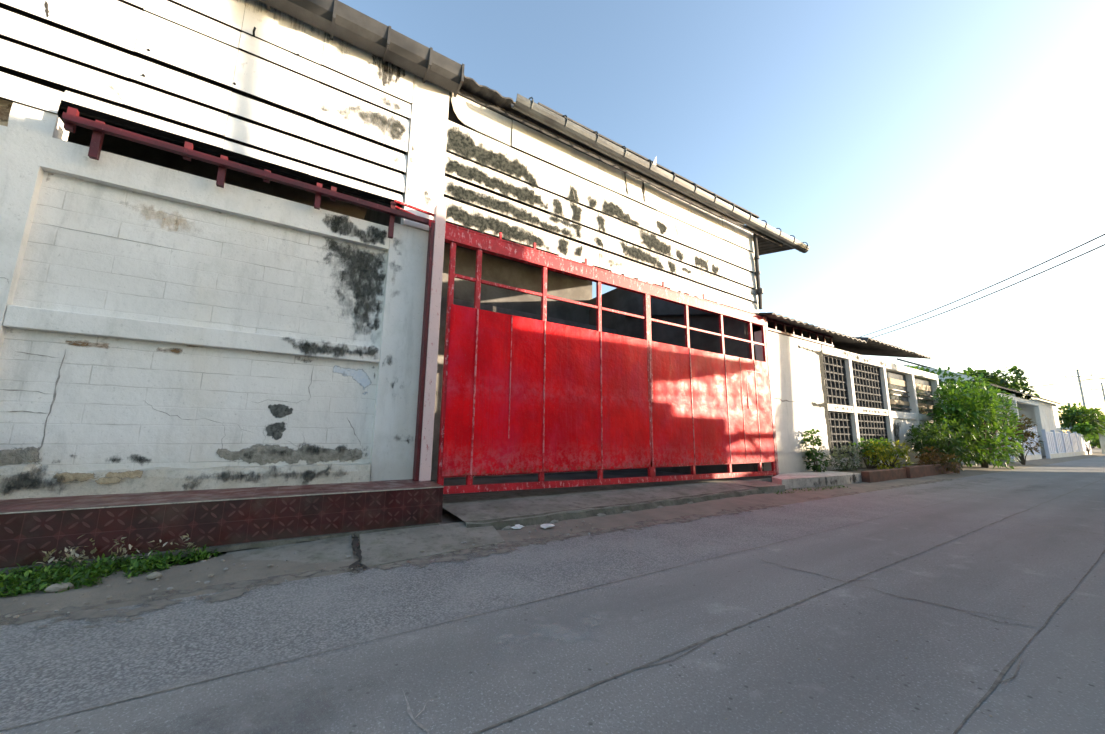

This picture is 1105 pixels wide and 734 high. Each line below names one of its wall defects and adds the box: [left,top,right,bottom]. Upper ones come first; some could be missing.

flaking render [0,99,13,127]
damp [323,215,387,330]
damp [550,186,640,256]
damp [669,249,719,274]
crack [0,352,65,452]
crack [0,466,1105,734]